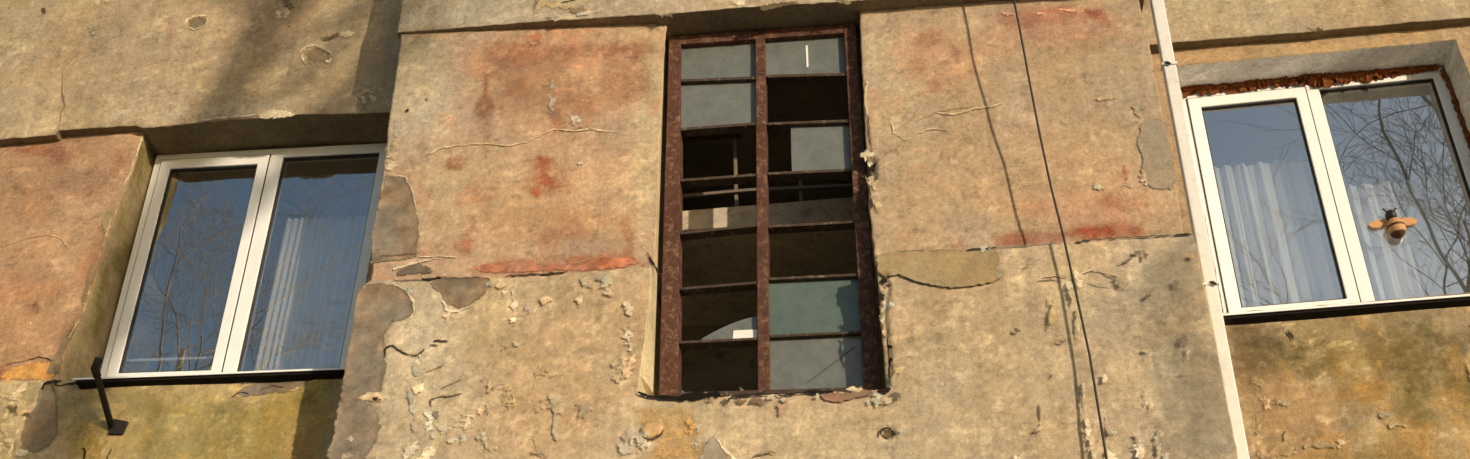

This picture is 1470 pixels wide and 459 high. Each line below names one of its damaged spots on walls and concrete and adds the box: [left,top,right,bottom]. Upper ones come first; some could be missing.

flaking render [184,13,208,30]
flaking render [300,30,355,64]
peeling [534,0,591,21]
peeling [381,253,553,324]
peeling [575,273,636,383]
leakage [1234,323,1449,419]
peeling [403,358,595,459]
peeling [618,408,776,459]